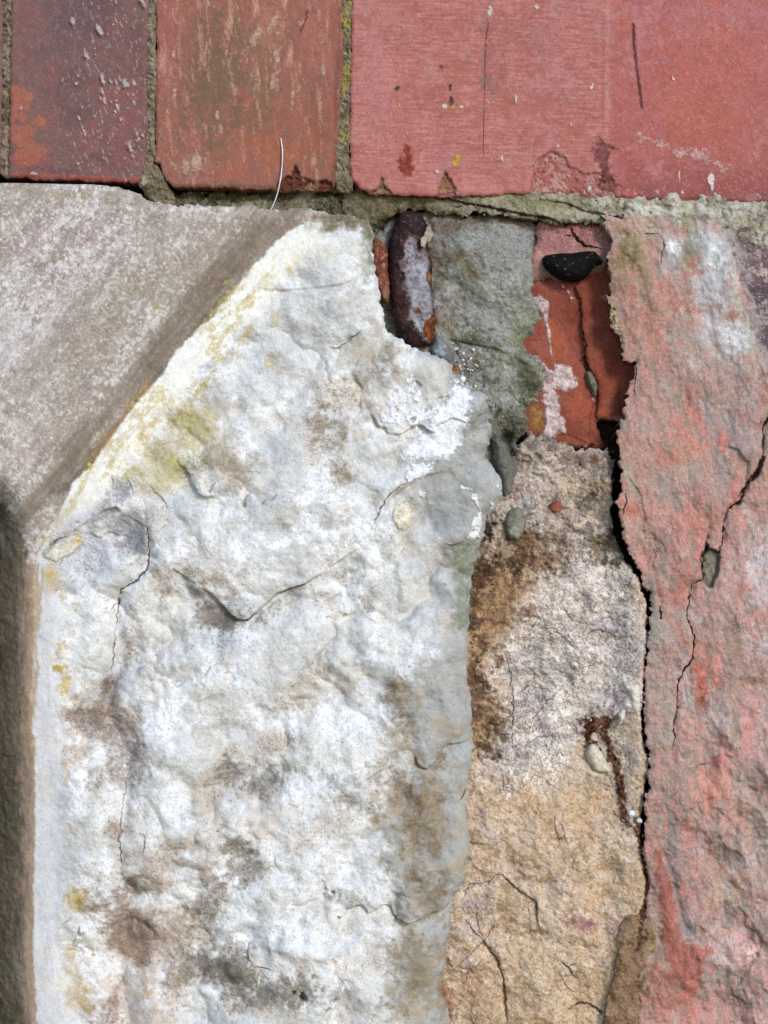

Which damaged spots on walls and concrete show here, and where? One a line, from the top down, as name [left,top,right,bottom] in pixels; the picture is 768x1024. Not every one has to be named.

spalling [531,150,614,195]
rust [414,307,437,341]
spalling [523,221,636,450]
crack [111,528,150,672]
crack [659,417,768,753]
crack [494,600,624,793]
rust [580,706,648,877]
crack [454,873,540,1020]
rust [635,904,649,952]